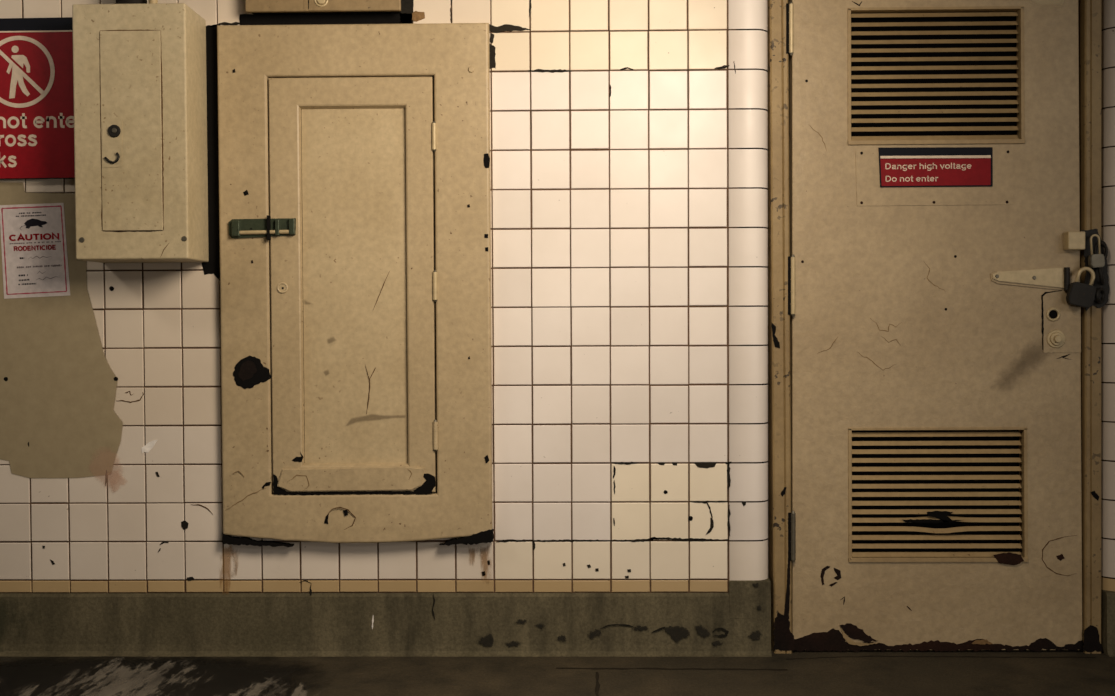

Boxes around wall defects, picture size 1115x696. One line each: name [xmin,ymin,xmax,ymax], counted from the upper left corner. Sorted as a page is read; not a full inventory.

spalling [489,24,531,69]
spalling [479,634,519,647]
spalling [588,624,729,646]